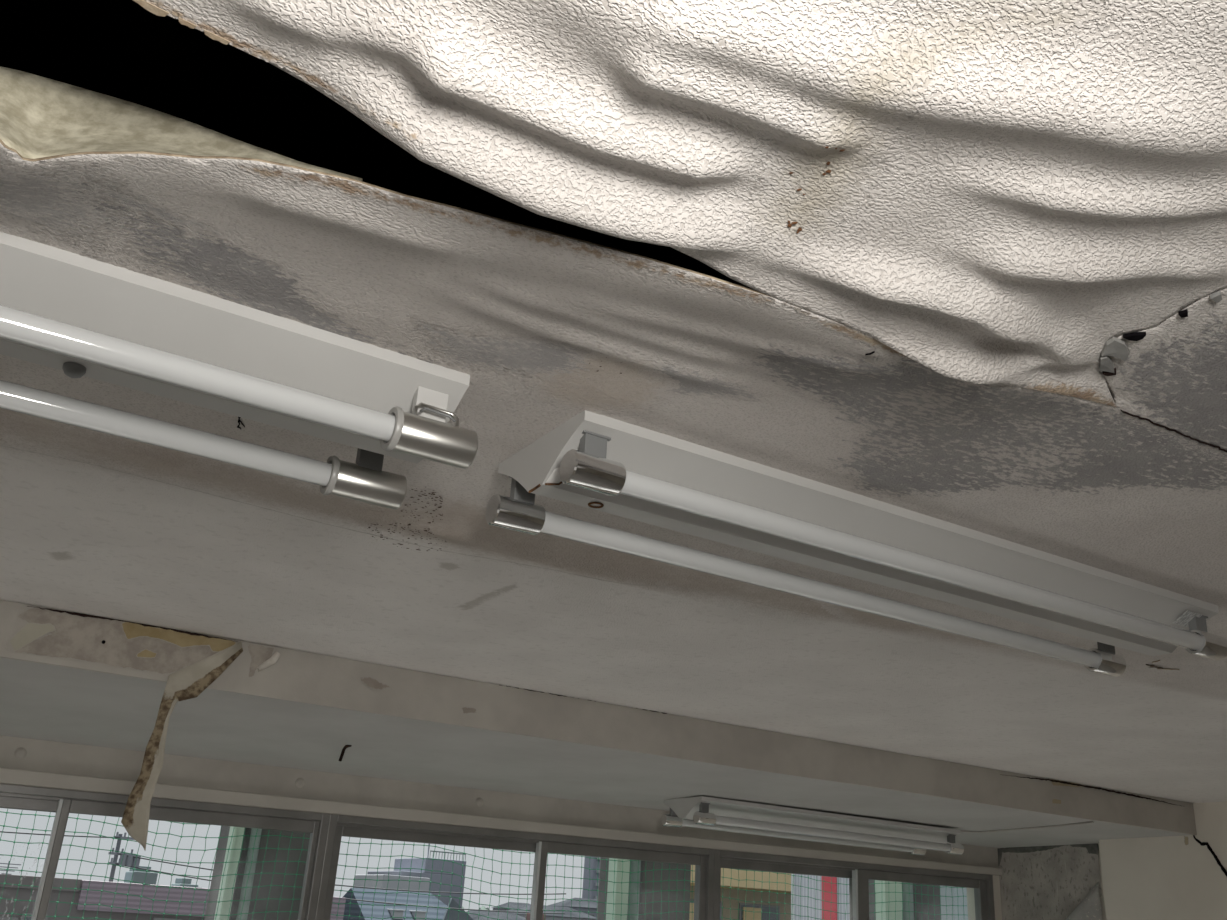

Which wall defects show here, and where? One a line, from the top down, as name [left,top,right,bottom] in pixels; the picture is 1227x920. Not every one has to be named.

peeling [0,151,441,364]
crack [1121,410,1227,452]
peeling [9,607,280,850]
peeling [997,843,1102,920]
crack [1193,835,1227,876]